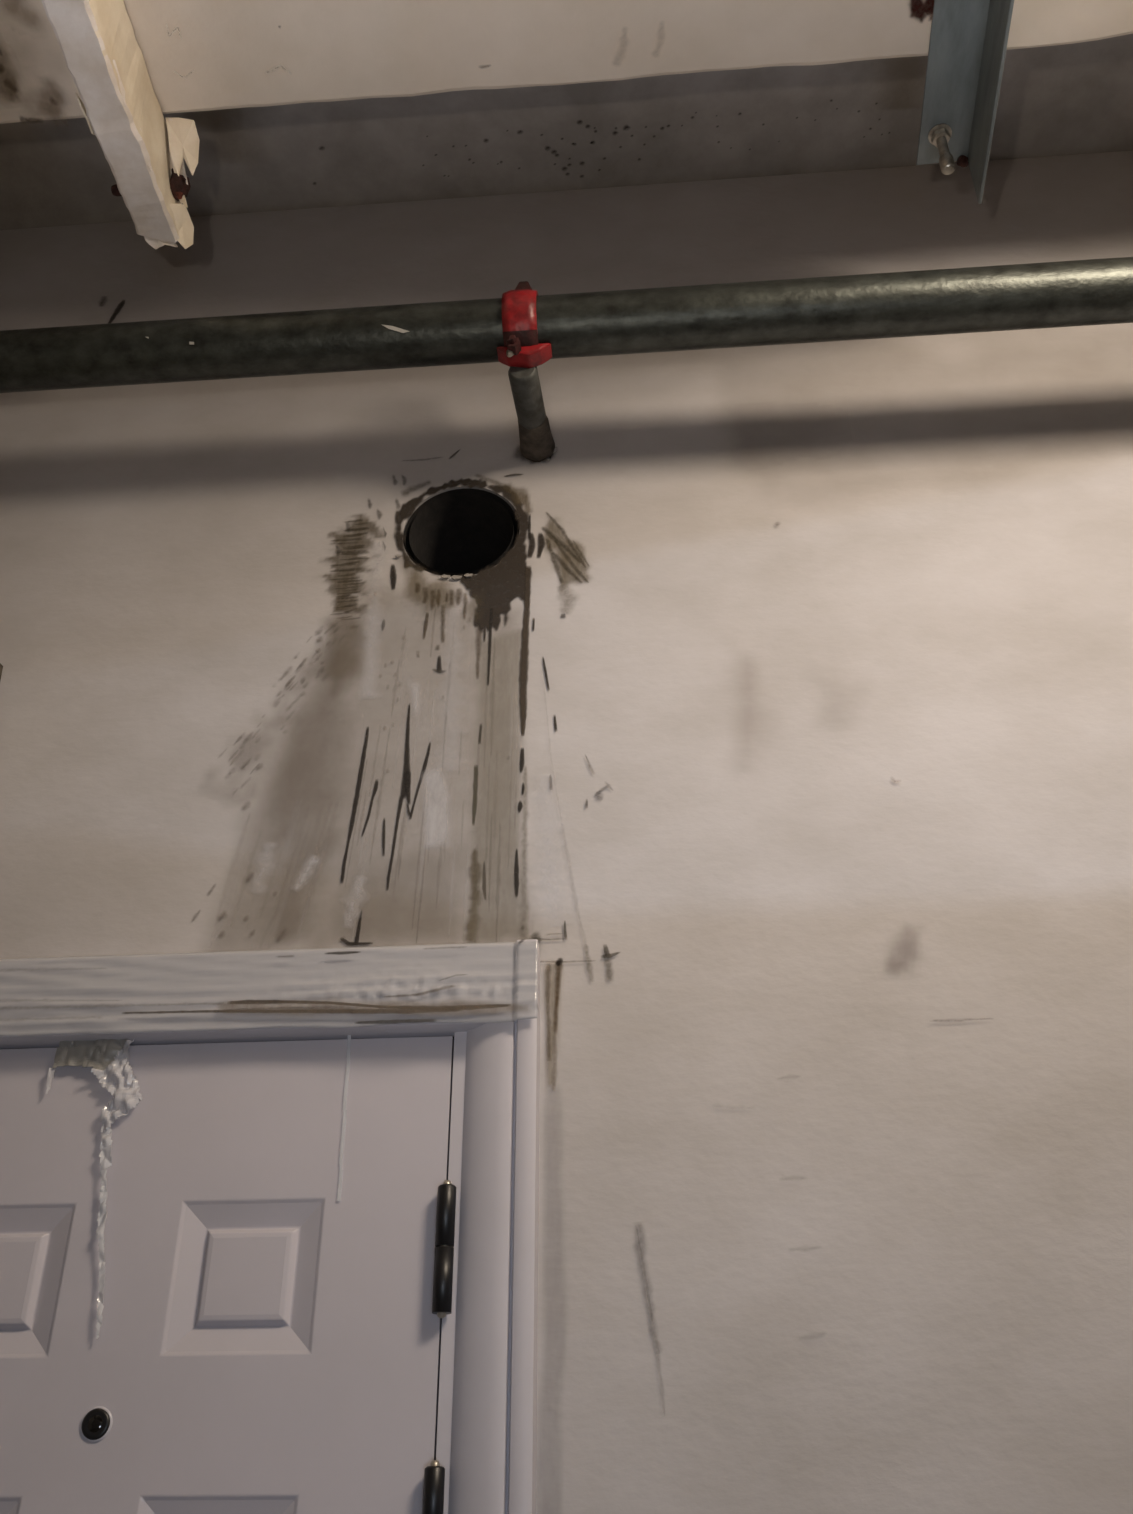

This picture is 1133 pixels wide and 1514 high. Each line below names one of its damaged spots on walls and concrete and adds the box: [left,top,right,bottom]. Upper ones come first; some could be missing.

rust [911,0,934,22]
water stain [468,851,486,941]